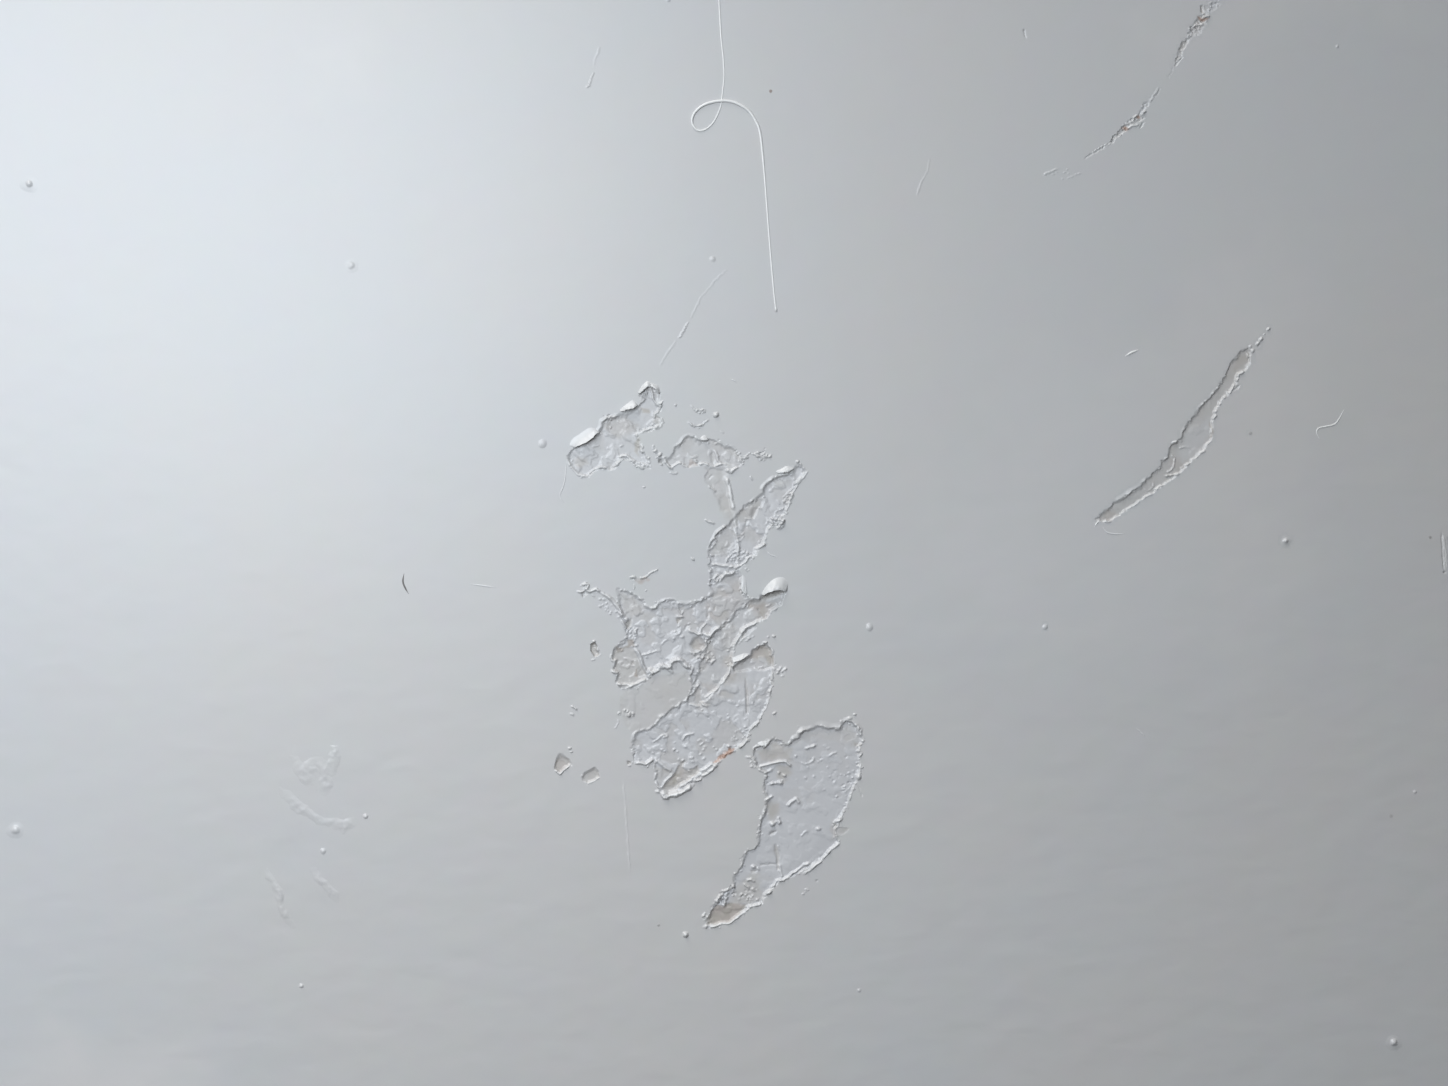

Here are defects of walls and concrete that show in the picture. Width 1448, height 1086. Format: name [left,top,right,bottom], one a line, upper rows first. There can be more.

spalling [1094,327,1271,523]
peeling [565,381,866,929]
peeling [554,747,600,785]